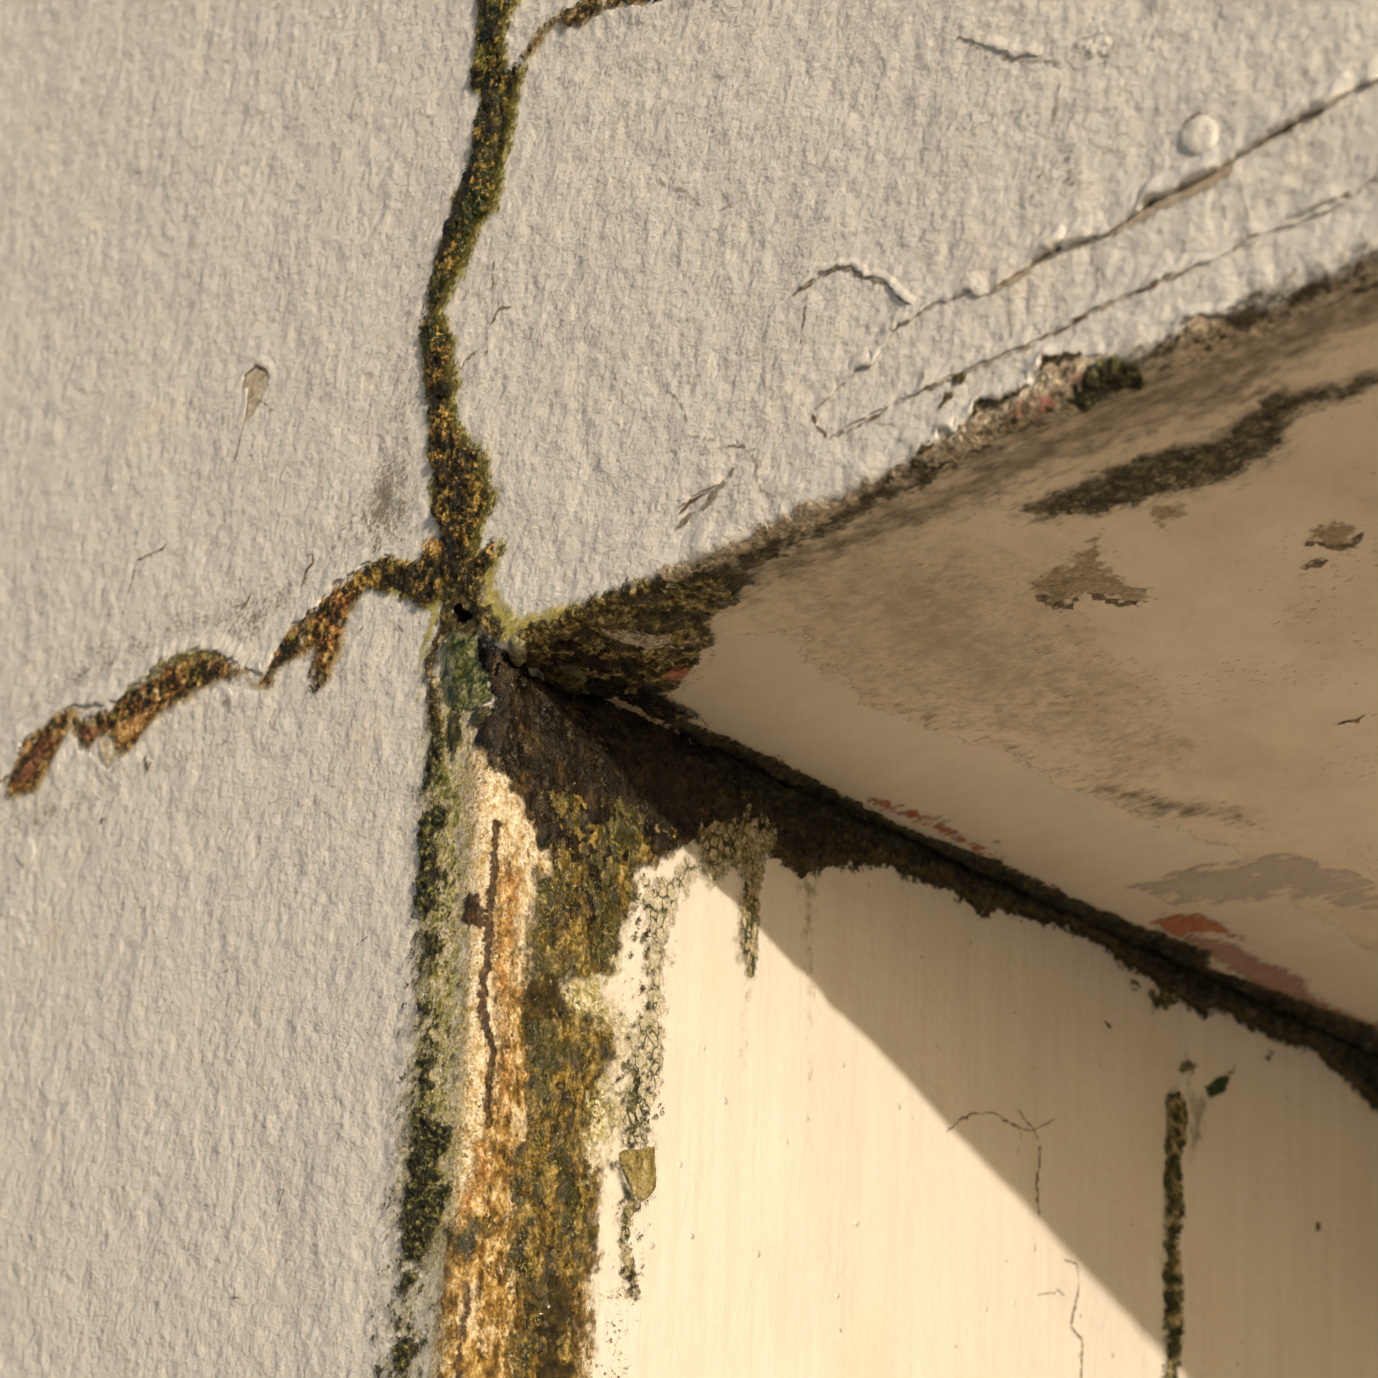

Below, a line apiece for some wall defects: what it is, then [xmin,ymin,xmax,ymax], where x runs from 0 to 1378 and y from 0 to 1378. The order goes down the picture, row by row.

crack [957,28,1061,64]
crack [660,179,728,210]
crack [791,256,915,344]
peeling [654,56,1378,593]
crack [0,0,711,843]
crack [672,394,769,496]
leakage [474,663,1378,1378]